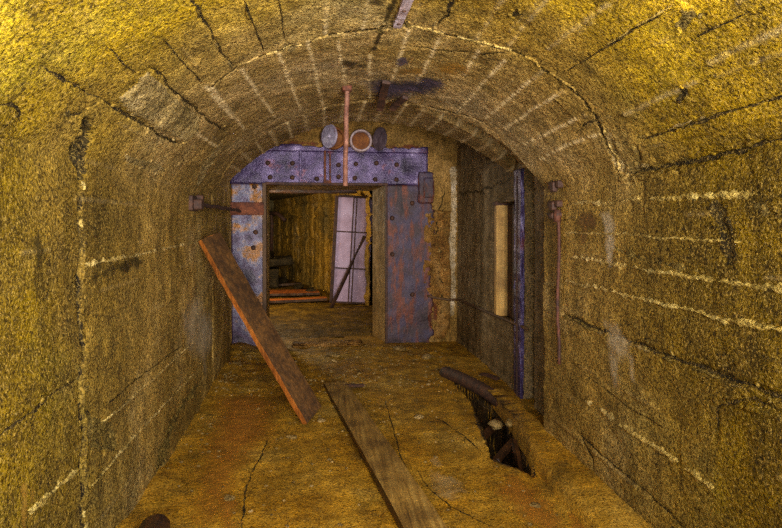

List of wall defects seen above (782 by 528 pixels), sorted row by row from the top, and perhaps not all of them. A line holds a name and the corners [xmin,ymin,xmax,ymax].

crack [40,64,186,161]
leakage [371,58,444,97]
crack [102,0,782,176]
crack [0,181,182,528]